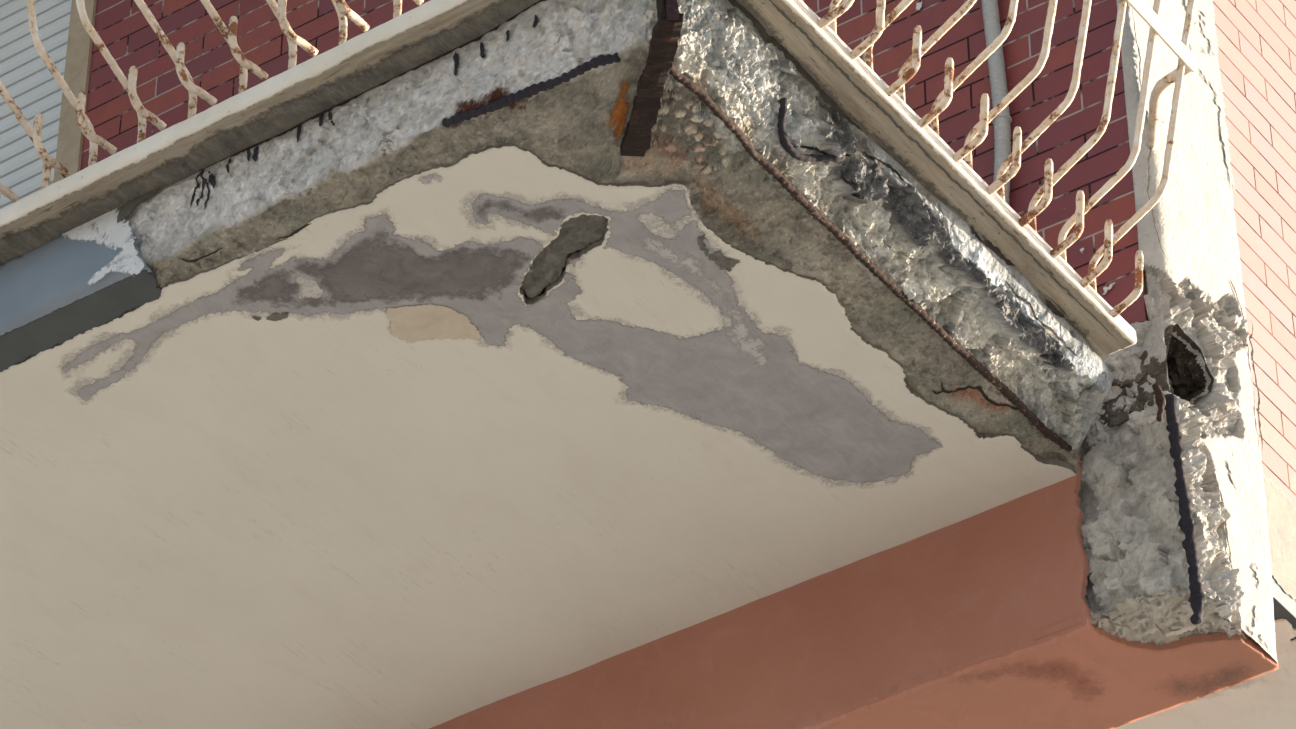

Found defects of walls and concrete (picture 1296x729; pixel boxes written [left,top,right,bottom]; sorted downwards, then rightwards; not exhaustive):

crack [199,0,546,189]
rust [454,88,526,118]
rust [608,80,629,140]
crack [728,0,911,202]
crack [117,187,160,223]
crack [180,248,223,262]
crack [277,223,312,240]
peeling [59,0,942,487]
spalling [599,0,1249,646]
crack [1188,277,1263,448]
peeling [1263,473,1296,599]
peeling [1246,605,1272,651]